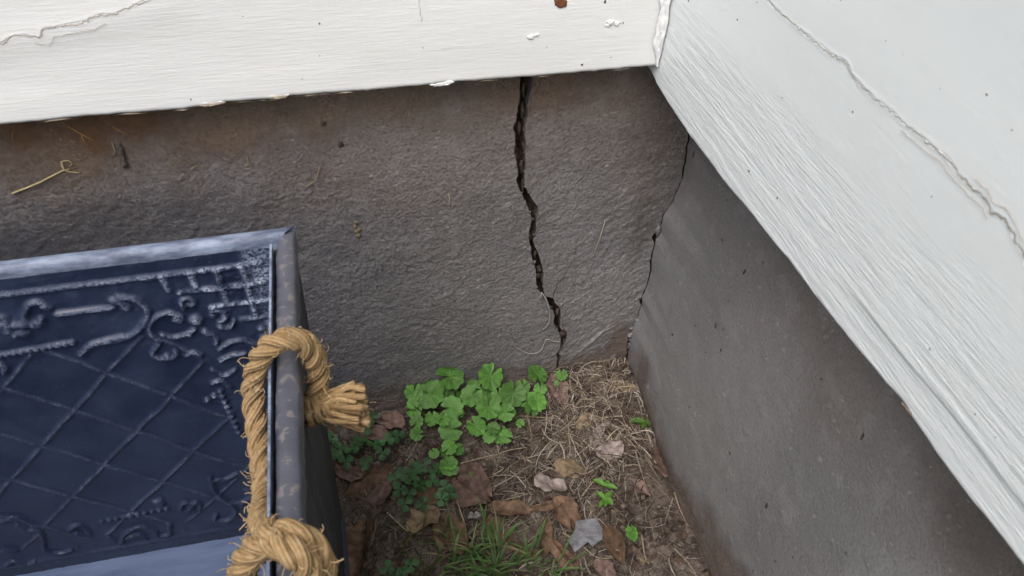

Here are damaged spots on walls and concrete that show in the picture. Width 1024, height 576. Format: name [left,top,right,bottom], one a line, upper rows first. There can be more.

crack [0,0,153,49]
crack [513,76,576,368]
crack [761,0,1024,260]